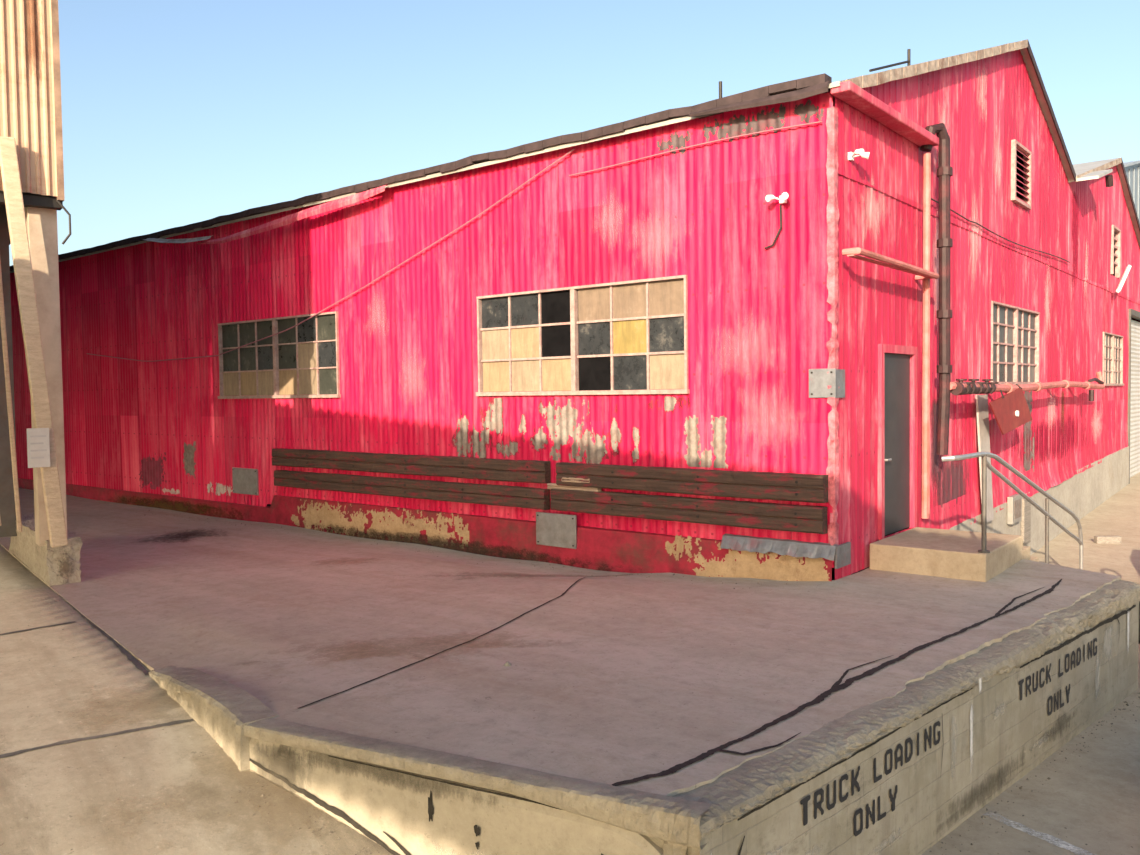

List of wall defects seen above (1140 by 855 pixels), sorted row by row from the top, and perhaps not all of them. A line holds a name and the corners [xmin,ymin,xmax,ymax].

rust [26,0,39,60]
peeling [452,398,640,464]
peeling [648,396,728,468]
peeling [291,499,469,545]
peeling [665,535,830,581]
crack [1020,605,1136,668]
crack [611,579,1062,786]
crack [738,688,973,855]